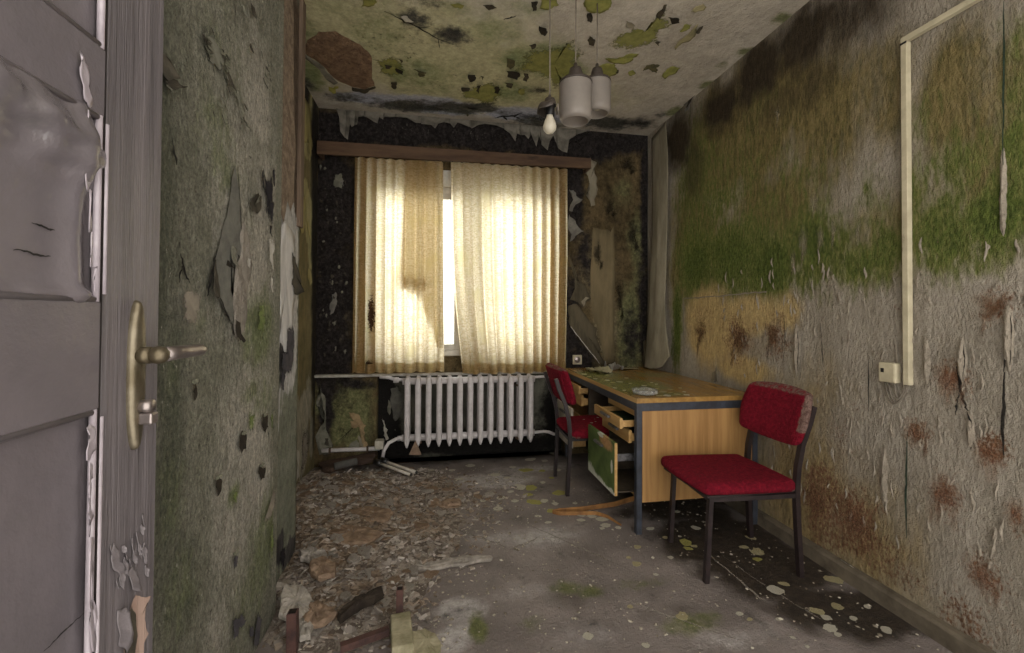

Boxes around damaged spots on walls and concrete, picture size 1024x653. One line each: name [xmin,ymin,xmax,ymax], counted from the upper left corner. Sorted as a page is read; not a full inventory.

peeling [461,26,595,116]
peeling [531,0,558,11]
peeling [583,0,612,23]
peeling [600,4,706,79]
spalling [247,0,426,357]
peeling [183,165,262,342]
crack [955,366,972,427]
crack [999,359,1007,455]
peeling [110,514,151,653]